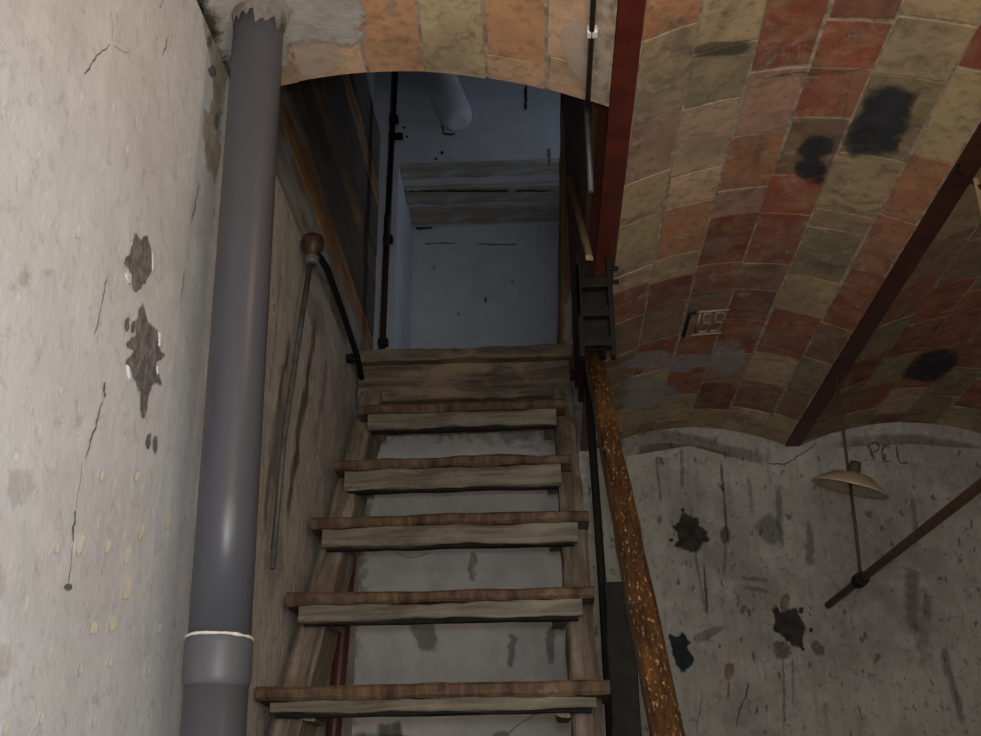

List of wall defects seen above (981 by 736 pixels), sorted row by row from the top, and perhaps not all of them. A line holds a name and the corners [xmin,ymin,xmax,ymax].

spalling [125,234,156,292]
spalling [125,304,165,418]
crack [86,382,106,456]
spalling [146,433,158,453]
crack [64,510,76,591]
peeling [669,508,709,552]
peeling [668,633,694,671]
peeling [772,594,824,659]